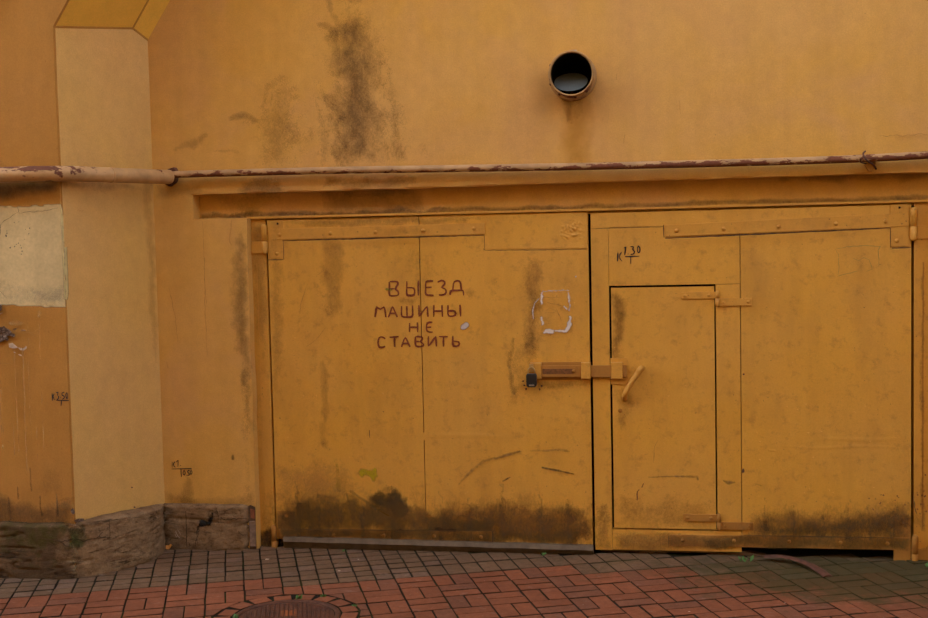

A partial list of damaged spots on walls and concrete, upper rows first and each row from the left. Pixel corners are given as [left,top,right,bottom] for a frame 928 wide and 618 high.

flaking render [0,326,27,356]
damp [346,490,409,519]